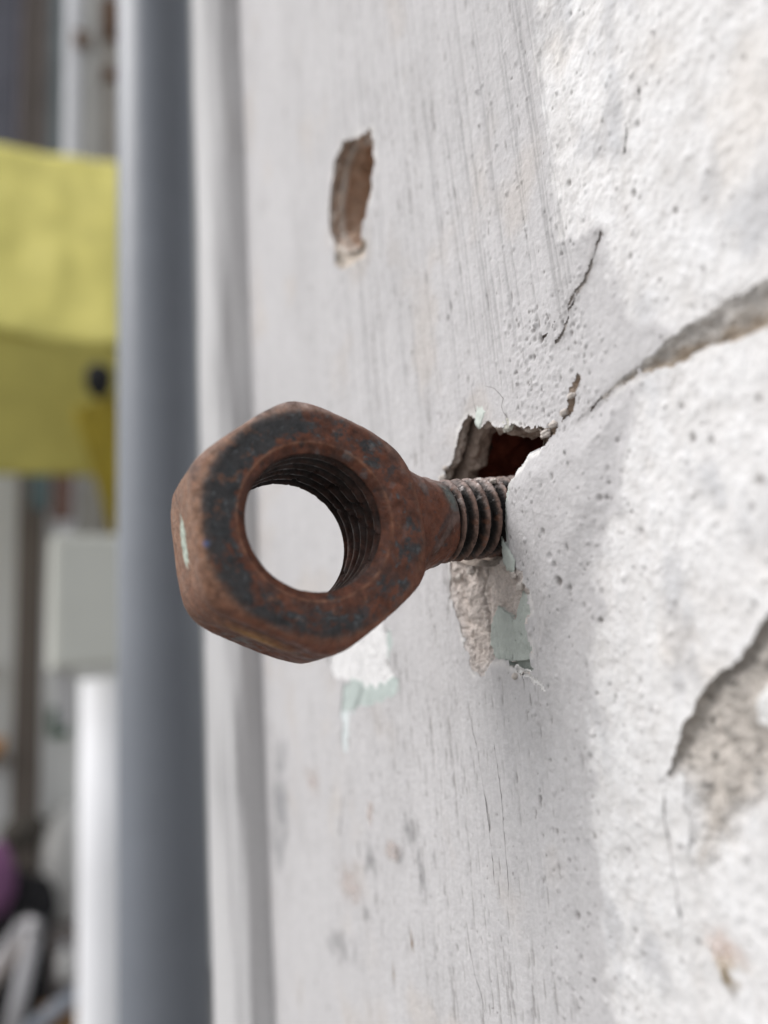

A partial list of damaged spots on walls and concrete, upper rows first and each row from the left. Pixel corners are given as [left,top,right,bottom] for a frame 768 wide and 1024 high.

spalling [334,237,367,270]
crack [542,230,604,344]
spalling [438,373,581,484]
crack [590,367,641,412]
flaking render [449,536,546,692]
flaking render [666,615,768,885]